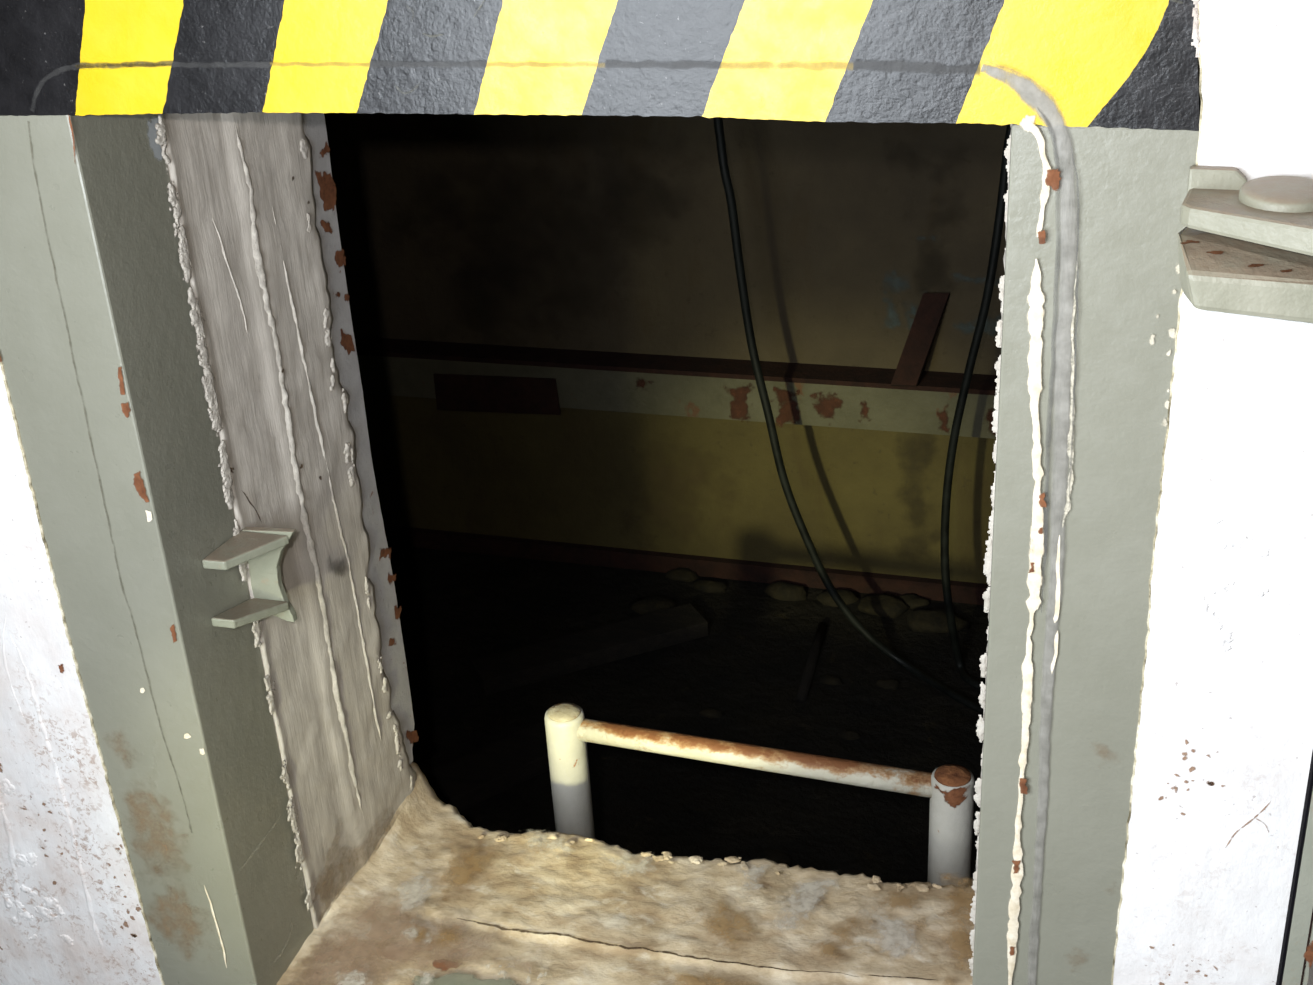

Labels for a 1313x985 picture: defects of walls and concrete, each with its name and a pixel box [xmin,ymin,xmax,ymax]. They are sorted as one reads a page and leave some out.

corrosion [315,142,337,234]
corrosion [335,249,346,267]
spalling [155,114,242,536]
spalling [323,305,348,413]
corrosion [340,329,355,355]
corrosion [729,384,751,420]
corrosion [773,387,843,427]
peeling [981,65,1079,985]
peeling [968,275,1005,976]
spalling [263,675,280,727]
spalling [279,760,305,870]
crack [457,918,935,980]